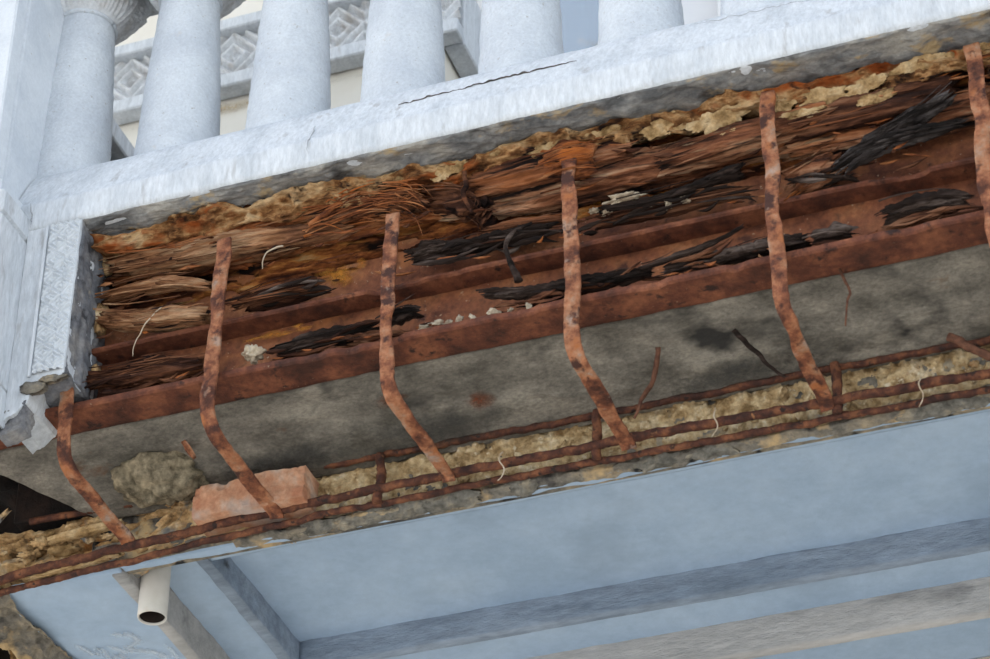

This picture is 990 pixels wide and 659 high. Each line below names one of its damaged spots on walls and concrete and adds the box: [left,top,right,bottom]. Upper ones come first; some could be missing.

crack [398,61,573,105]
spalling [0,49,968,447]
spalling [223,345,990,548]
spalling [0,501,210,659]